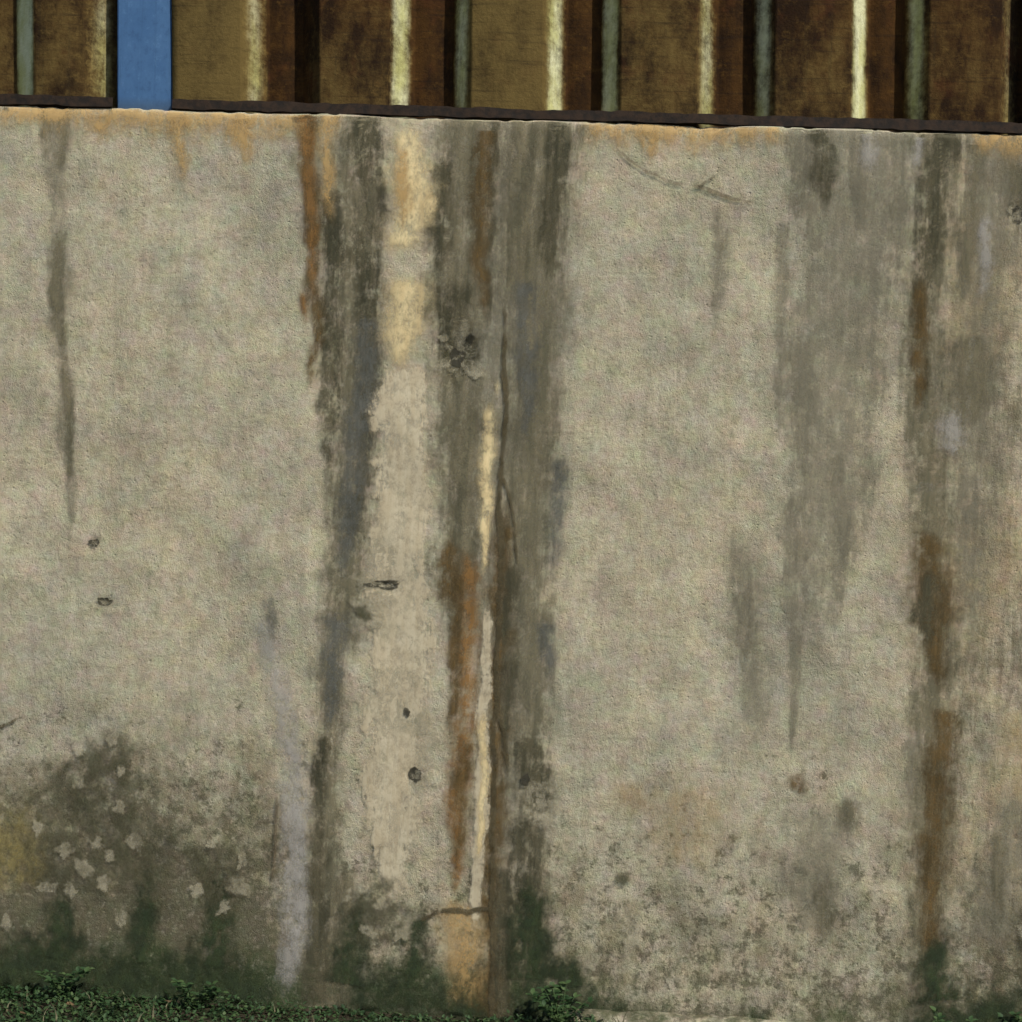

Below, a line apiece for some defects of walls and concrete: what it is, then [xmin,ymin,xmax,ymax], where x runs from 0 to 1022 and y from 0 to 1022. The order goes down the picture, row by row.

leakage [40,109,69,204]
leakage [48,224,75,514]
corrosion [0,107,338,376]
leakage [261,116,590,1018]
corrosion [447,560,479,886]
crack [422,311,518,1016]
leakage [775,129,1022,1005]
leakage [128,869,158,962]
leakage [195,879,235,967]